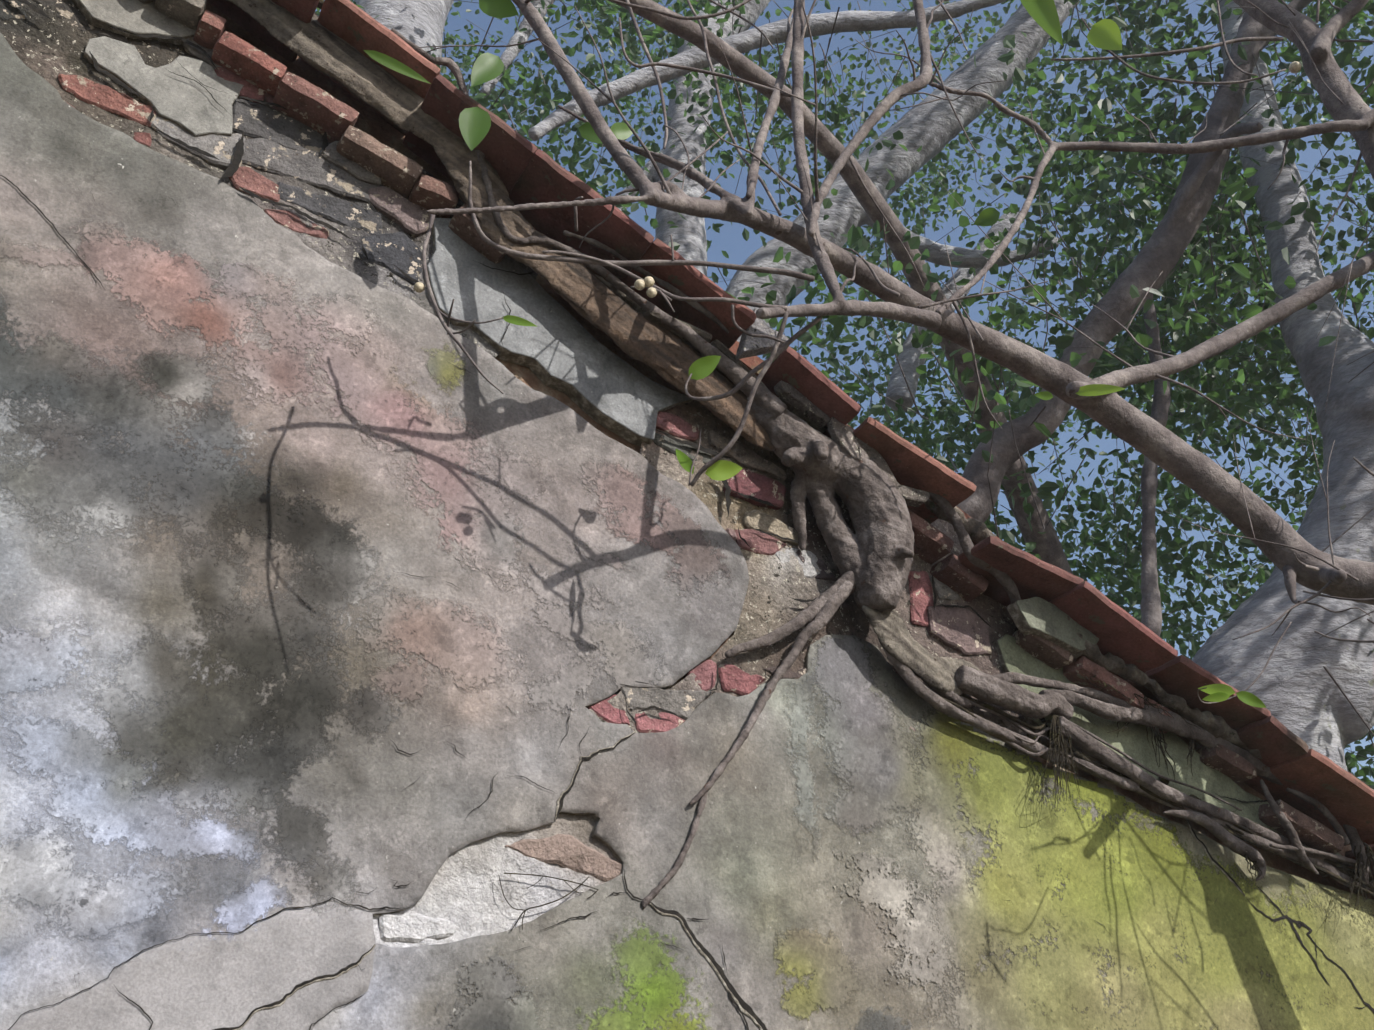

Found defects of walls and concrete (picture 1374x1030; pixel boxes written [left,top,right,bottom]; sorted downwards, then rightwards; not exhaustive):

spalling [0,0,501,358]
spalling [735,308,789,360]
damp [0,215,667,945]
damp [562,456,732,601]
spalling [587,393,942,733]
spalling [895,518,1099,675]
crack [392,725,464,789]
crack [465,708,636,820]
spalling [963,693,1048,737]
crack [8,879,413,1030]
spalling [373,814,622,948]
crack [513,871,767,1030]